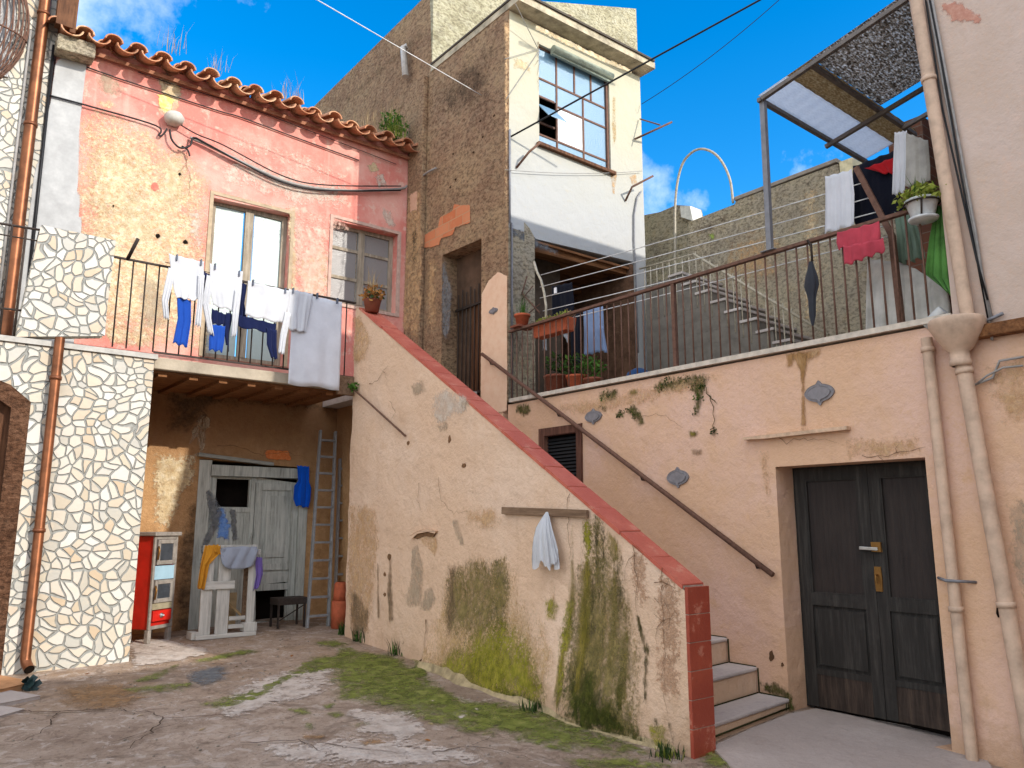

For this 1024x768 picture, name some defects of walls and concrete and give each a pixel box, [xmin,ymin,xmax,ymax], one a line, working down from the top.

peeling [942,2,981,23]
flaking render [403,191,451,336]
corrosion [787,349,819,425]
flaking render [153,415,210,528]
flaking render [407,529,438,610]
leakage [637,616,649,699]